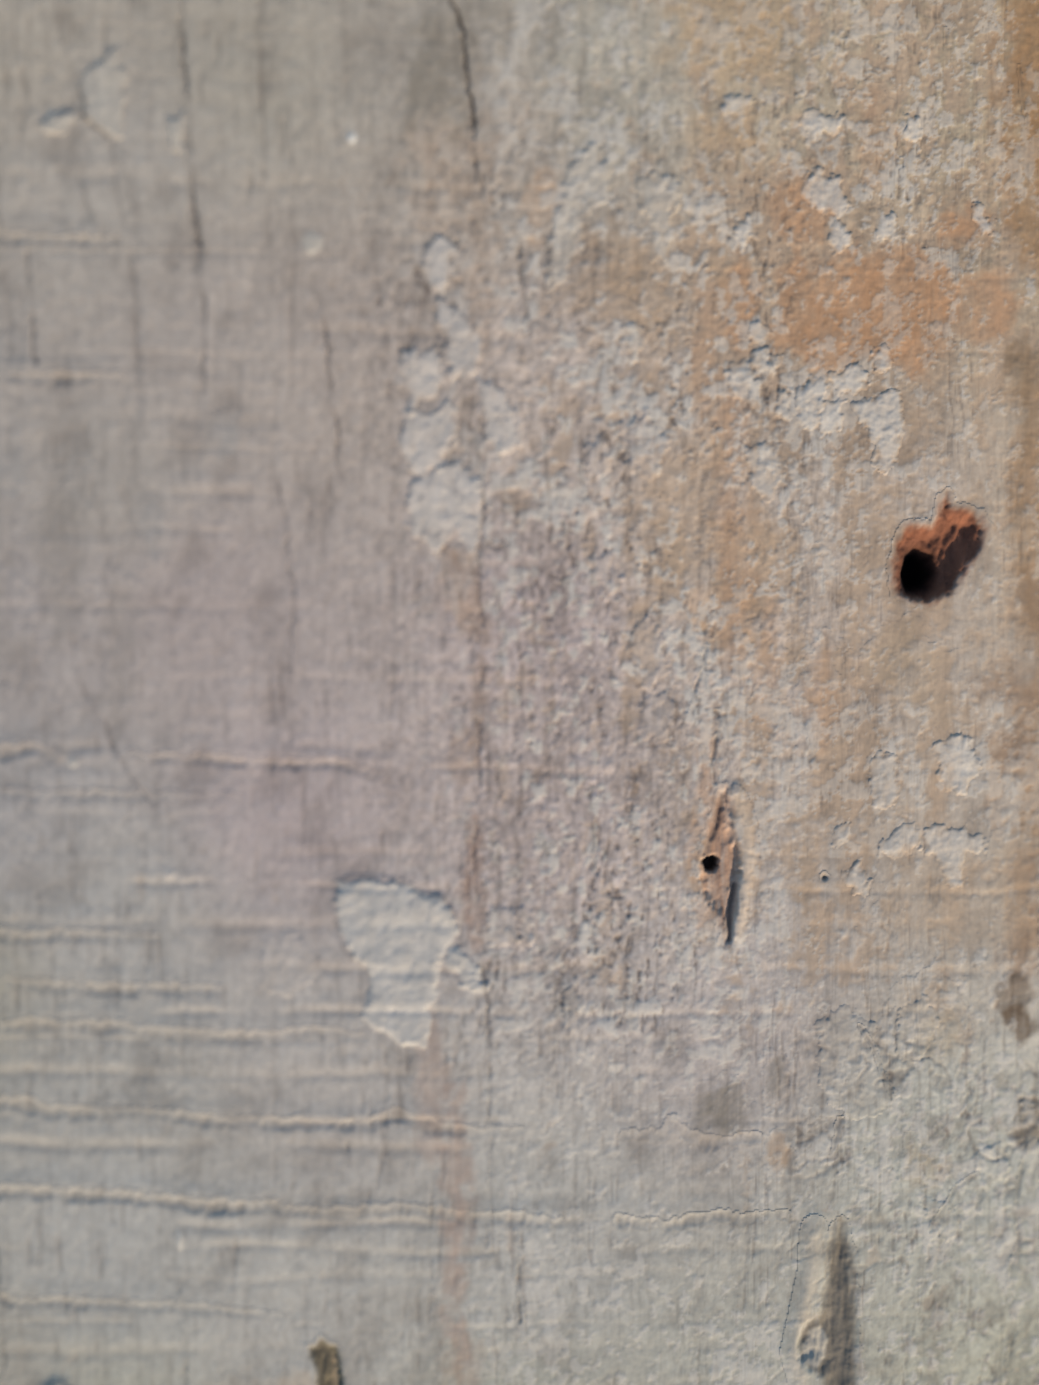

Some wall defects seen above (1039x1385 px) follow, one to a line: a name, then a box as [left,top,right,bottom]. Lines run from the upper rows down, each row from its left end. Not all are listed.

peeling [40,47,129,140]
crack [176,0,208,395]
crack [448,0,555,336]
peeling [395,233,524,559]
peeling [333,878,490,1049]
spalling [305,1334,347,1385]
spalling [780,1214,864,1385]